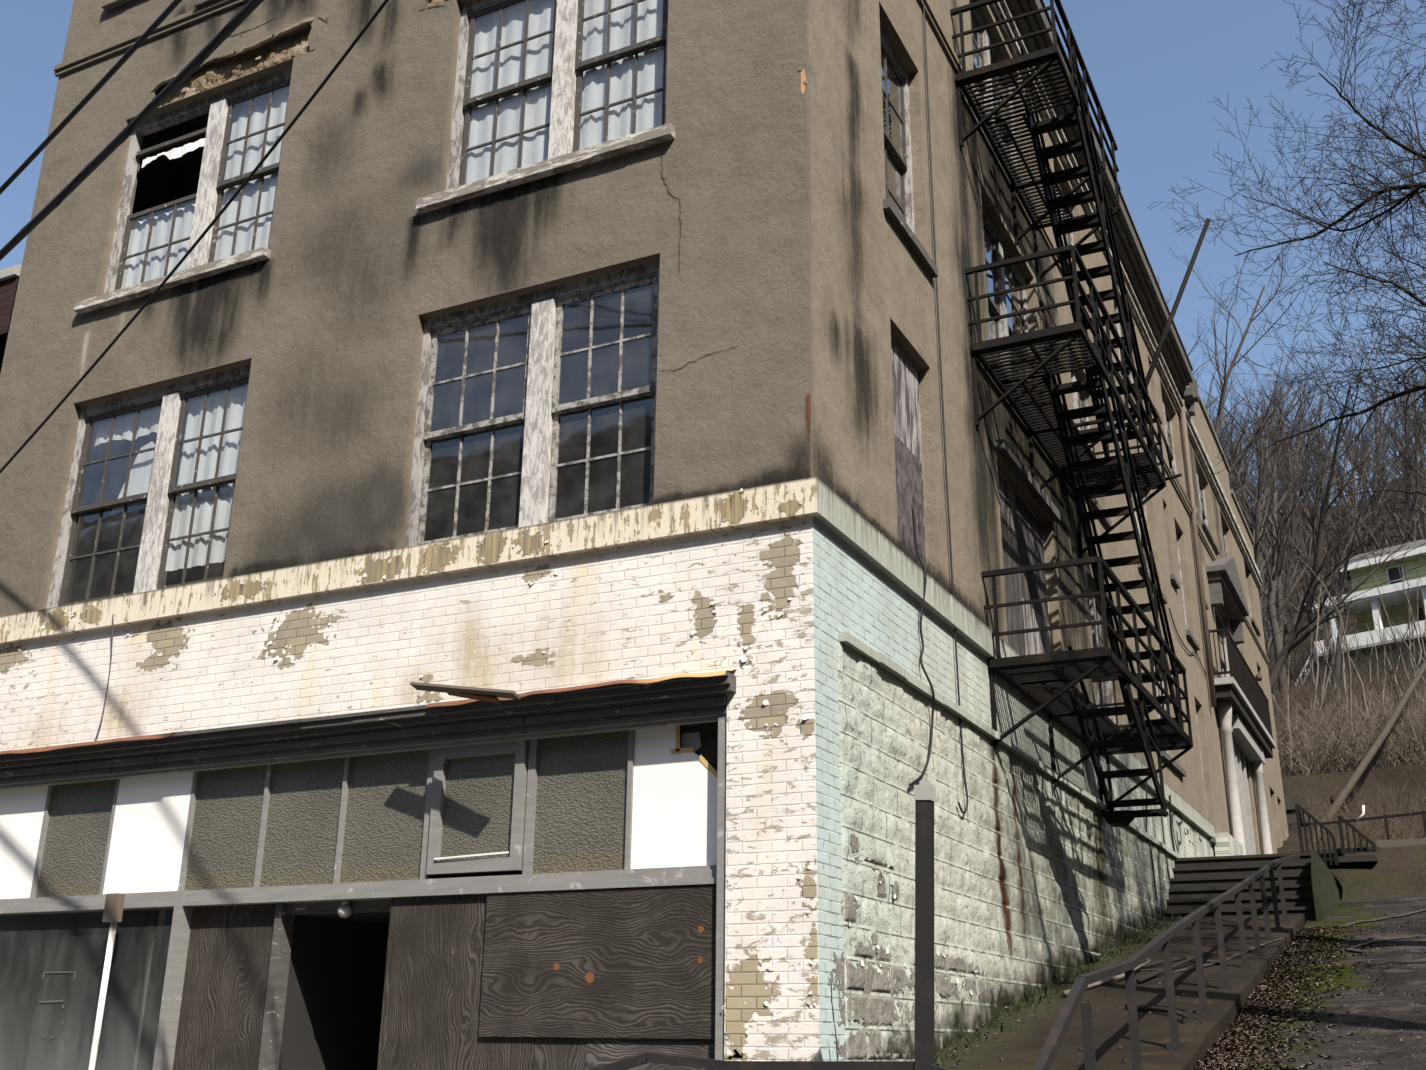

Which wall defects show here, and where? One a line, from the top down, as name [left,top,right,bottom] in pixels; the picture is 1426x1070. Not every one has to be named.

peeling [720,488,758,524]
peeling [213,580,271,602]
peeling [354,541,459,583]
peeling [476,527,558,585]
peeling [690,590,717,643]
peeling [737,499,803,669]